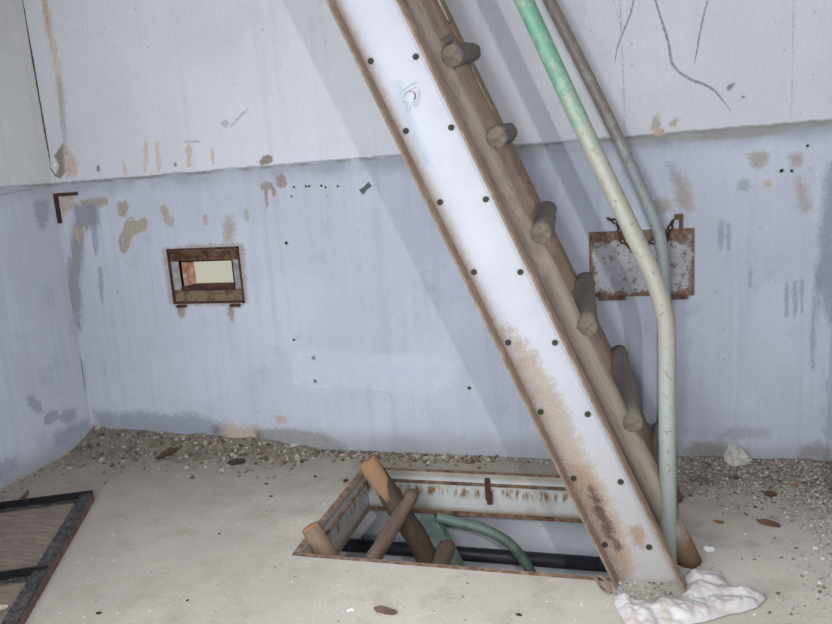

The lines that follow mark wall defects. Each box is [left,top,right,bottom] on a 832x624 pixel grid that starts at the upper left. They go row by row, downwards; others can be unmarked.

crack [22,0,62,178]
crack [613,0,635,130]
crack [655,0,731,112]
peeling [81,197,147,253]
corrosion [163,215,247,322]
corrosion [500,325,644,578]